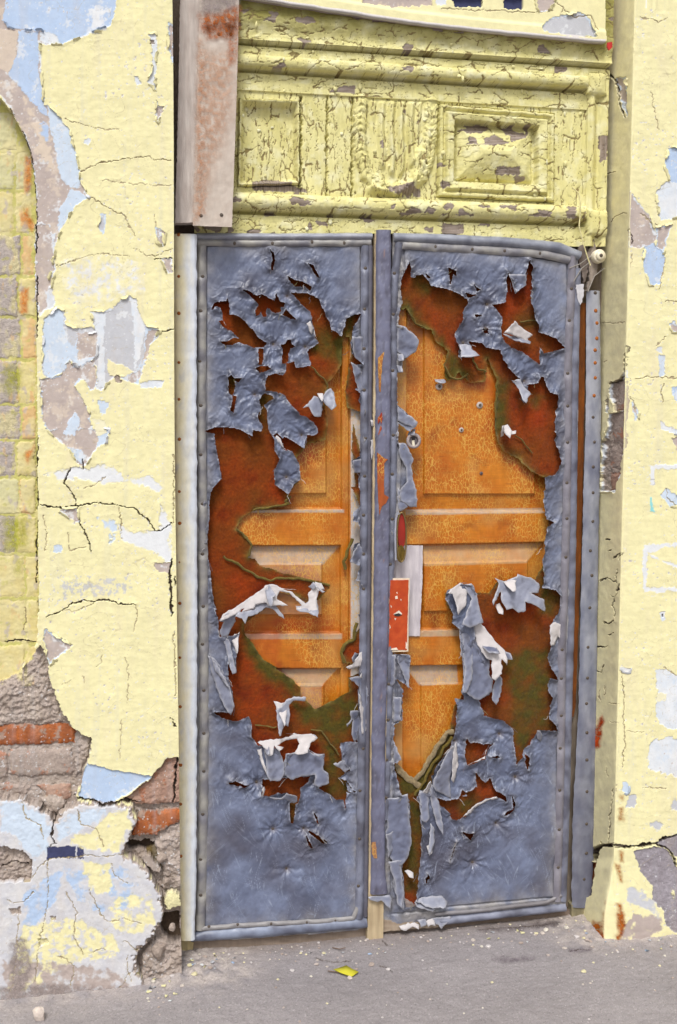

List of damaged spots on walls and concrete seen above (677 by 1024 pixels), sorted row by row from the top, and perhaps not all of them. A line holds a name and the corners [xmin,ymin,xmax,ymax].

rust [202,9,238,60]
peeling [362,0,599,37]
peeling [0,0,164,492]
crack [22,131,173,337]
peeling [630,145,677,289]
spalling [600,372,641,494]
crack [7,437,175,642]
peeling [97,505,173,573]
crack [169,558,177,726]
crack [592,538,677,881]
spalling [0,628,217,1001]
spalling [605,834,677,951]